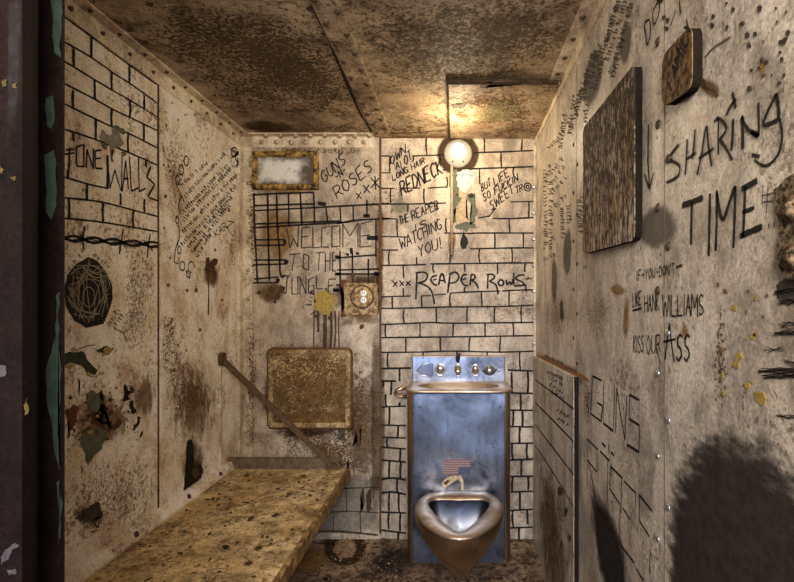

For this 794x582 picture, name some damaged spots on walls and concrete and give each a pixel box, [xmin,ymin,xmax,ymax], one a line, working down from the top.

peeling [51,0,63,58]
peeling [45,95,55,130]
peeling [44,150,57,220]
peeling [449,169,478,232]
peeling [46,292,143,474]
corrosion [247,315,385,514]
corrosion [714,306,727,408]
leakage [597,512,625,582]